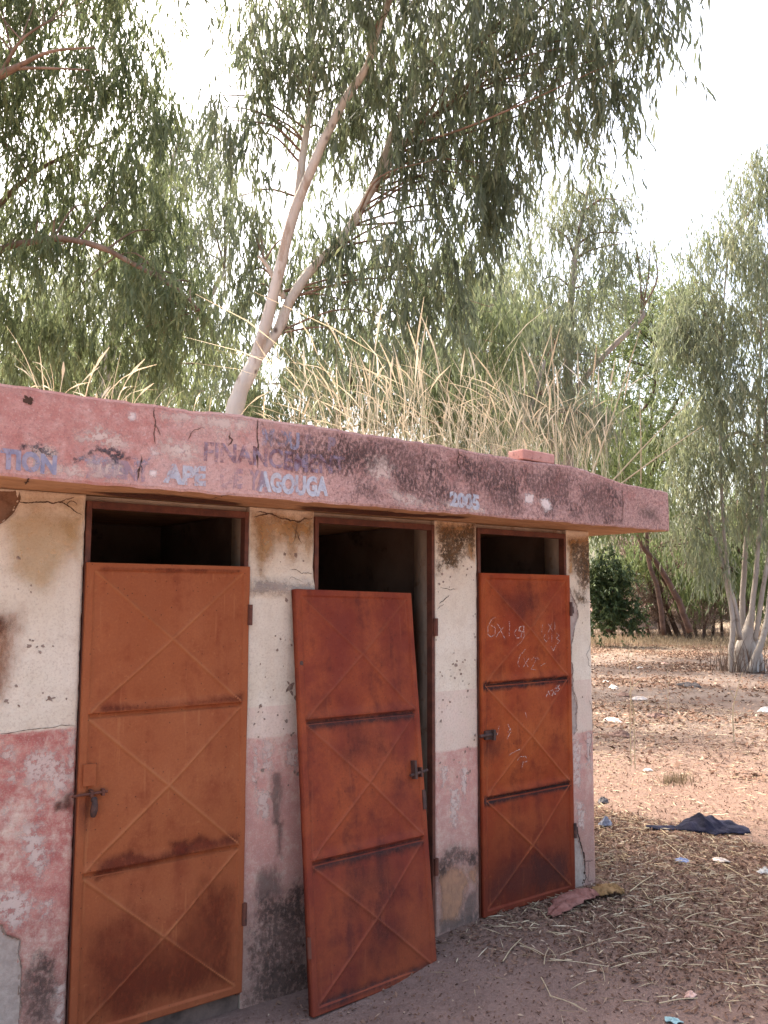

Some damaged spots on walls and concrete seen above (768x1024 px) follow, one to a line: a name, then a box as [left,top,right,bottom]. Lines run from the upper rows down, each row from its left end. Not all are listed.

crack [136,411,160,480]
crack [228,421,259,468]
crack [20,478,80,514]
water stain [270,437,616,520]
corrosion [483,677,569,689]
corrosion [308,712,414,729]
peeling [7,732,75,792]
corrosion [484,782,570,804]
peeling [20,824,46,871]
corrosion [97,837,235,875]
spalling [0,890,51,1024]
water stain [252,876,308,1003]